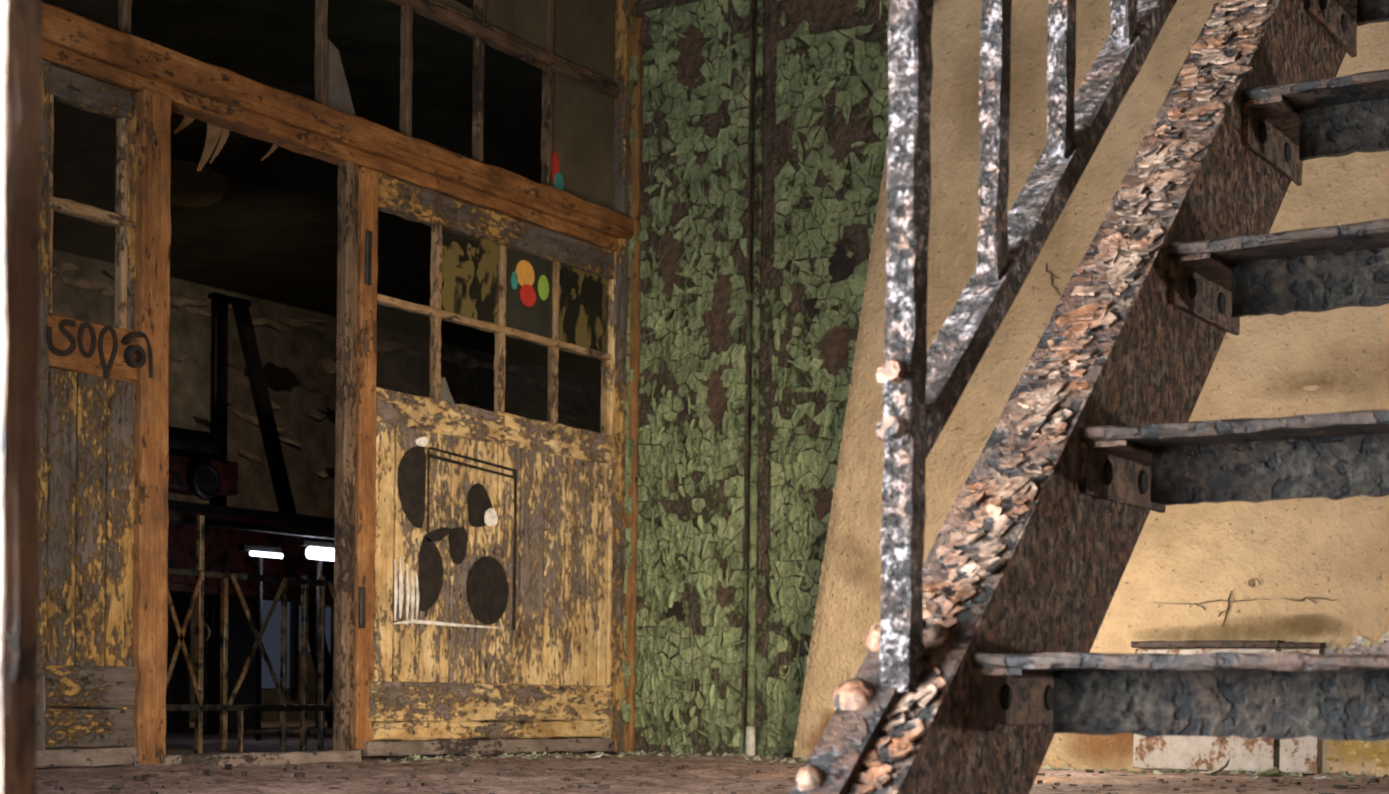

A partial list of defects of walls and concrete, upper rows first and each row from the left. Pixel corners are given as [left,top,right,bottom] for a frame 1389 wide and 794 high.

spalling [1322,631,1389,655]